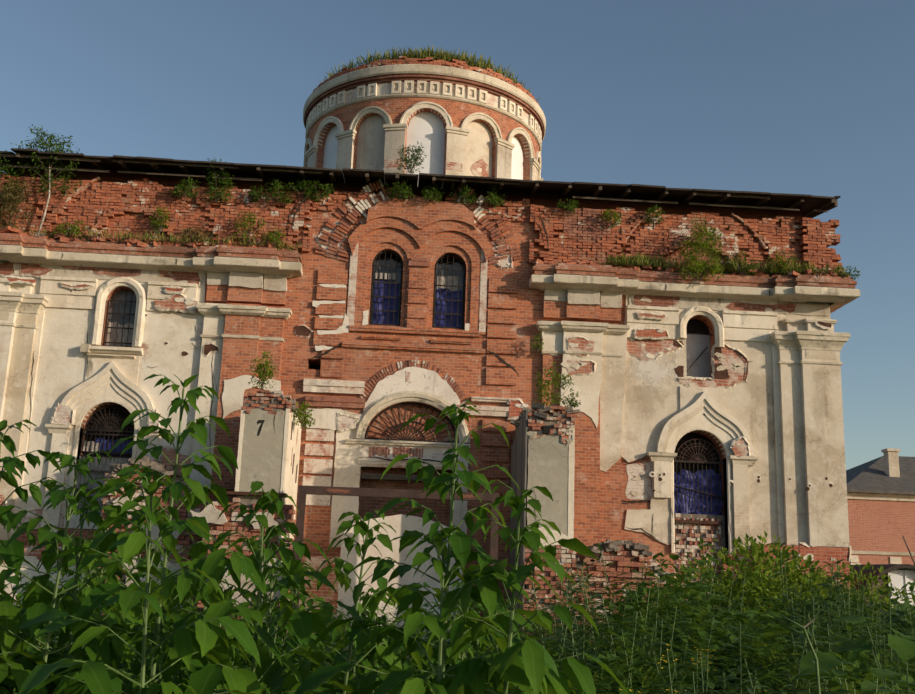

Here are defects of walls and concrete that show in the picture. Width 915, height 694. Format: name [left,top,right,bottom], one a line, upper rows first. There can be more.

flaking render [145,270,220,358]
flaking render [626,295,684,362]
flaking render [560,335,597,376]
flaking render [674,343,749,389]
flaking render [625,462,666,500]
spalling [583,549,603,564]